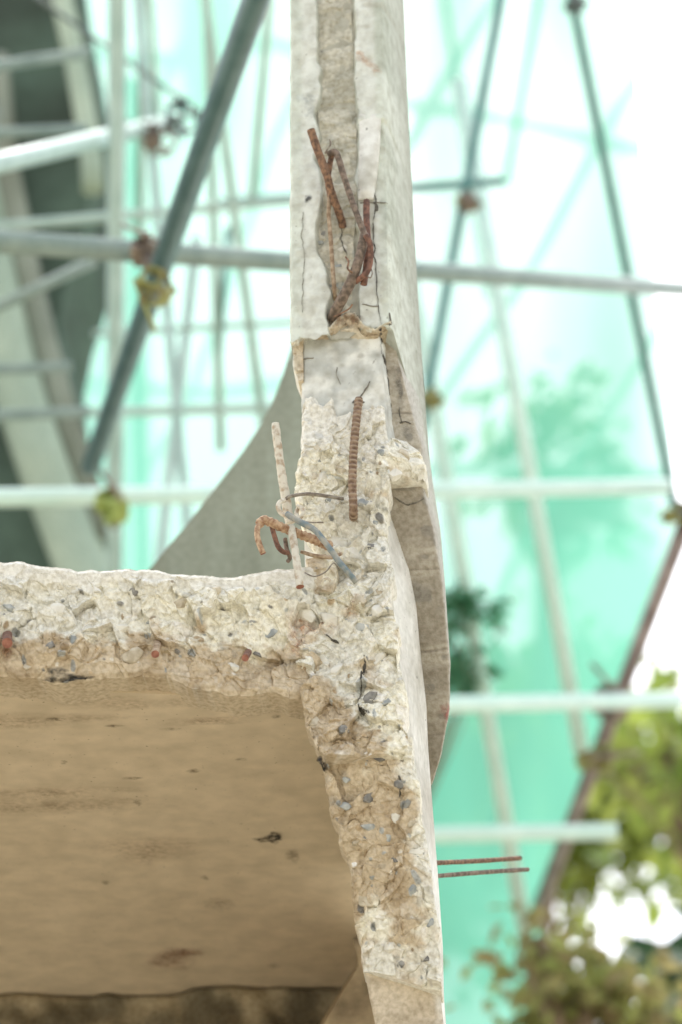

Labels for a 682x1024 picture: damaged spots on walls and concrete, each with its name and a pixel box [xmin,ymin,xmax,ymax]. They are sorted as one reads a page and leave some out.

spalling [0,0,444,1003]
crack [357,655,369,716]